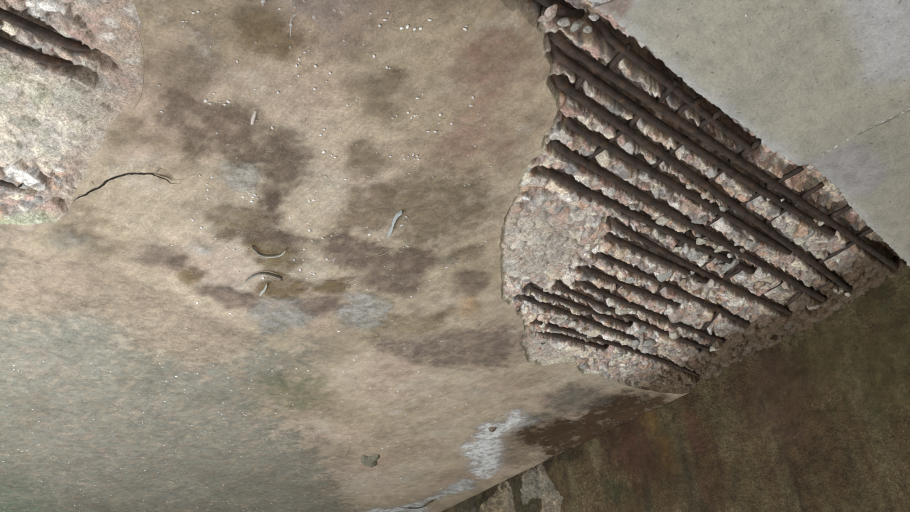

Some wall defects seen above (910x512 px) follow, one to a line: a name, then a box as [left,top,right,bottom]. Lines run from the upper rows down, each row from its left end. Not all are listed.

spalling [0,0,143,225]
crack [73,161,180,202]
spalling [499,0,906,394]
leakage [0,90,513,512]
peeling [245,272,283,297]
leakage [366,385,612,512]
peeling [479,463,563,512]